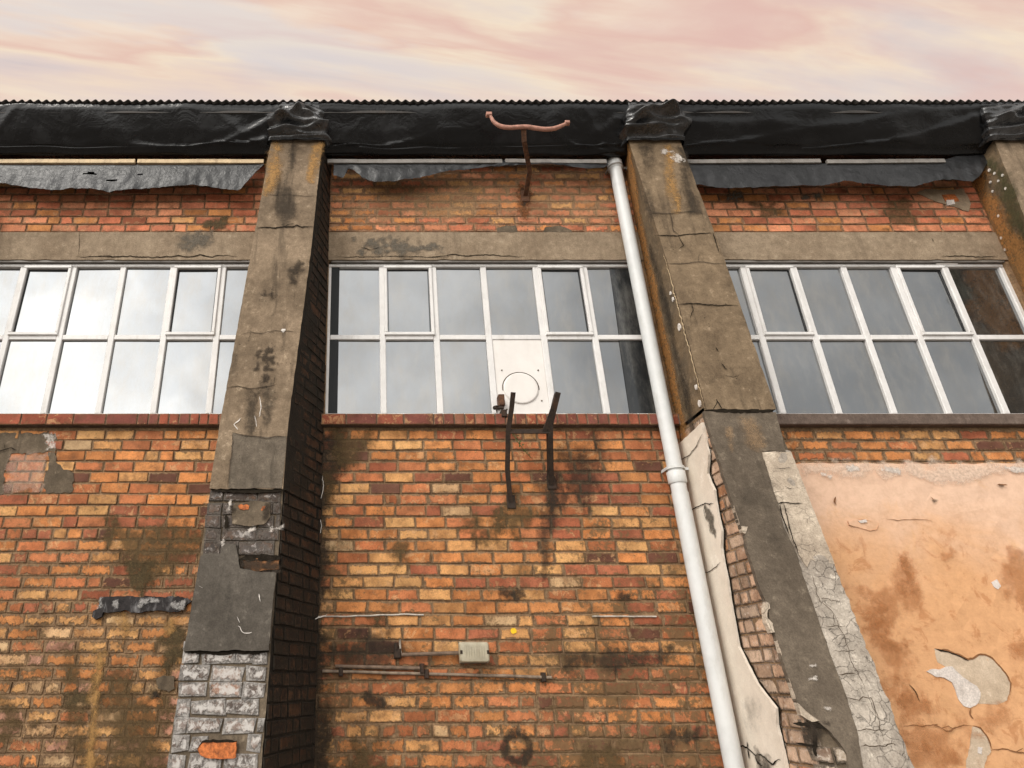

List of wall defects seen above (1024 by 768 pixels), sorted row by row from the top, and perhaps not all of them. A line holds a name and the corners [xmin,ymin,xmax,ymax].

crack [652,195,719,264]
crack [677,303,738,318]
crack [705,399,774,414]
spalling [229,500,283,532]
crack [779,467,803,553]
spalling [239,553,280,573]
spalling [761,602,782,655]
crack [812,576,970,747]
damp [86,648,106,768]
flaking render [926,648,1012,768]
spalling [197,739,237,759]
damp [500,729,533,766]